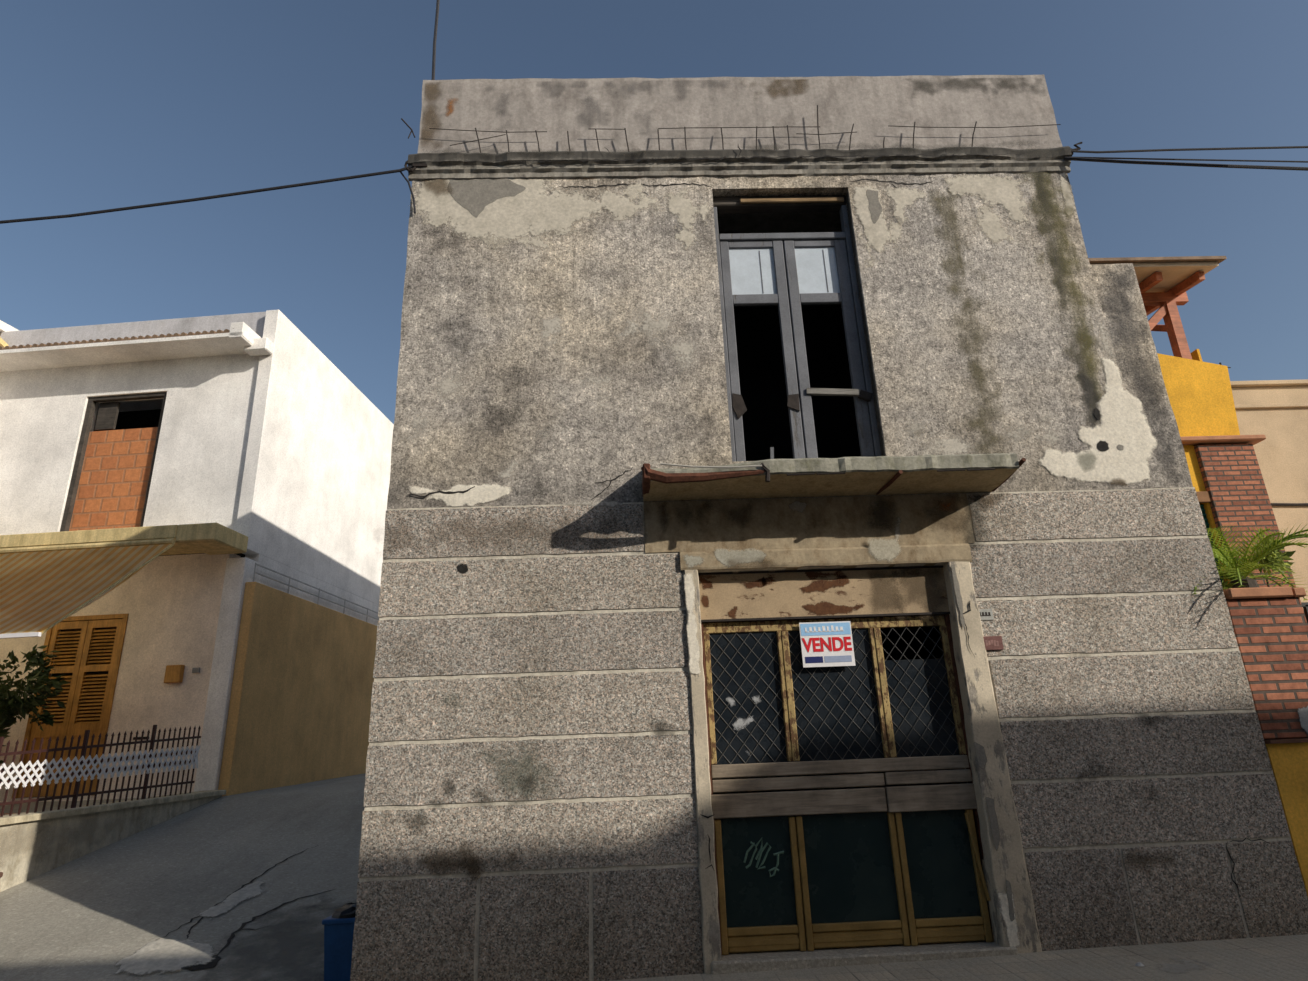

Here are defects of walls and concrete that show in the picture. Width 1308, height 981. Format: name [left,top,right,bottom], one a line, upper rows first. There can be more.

peeling [412,178,710,250]
peeling [937,320,1157,492]
peeling [408,461,518,507]
water stain [423,852,480,873]
crack [156,845,335,956]